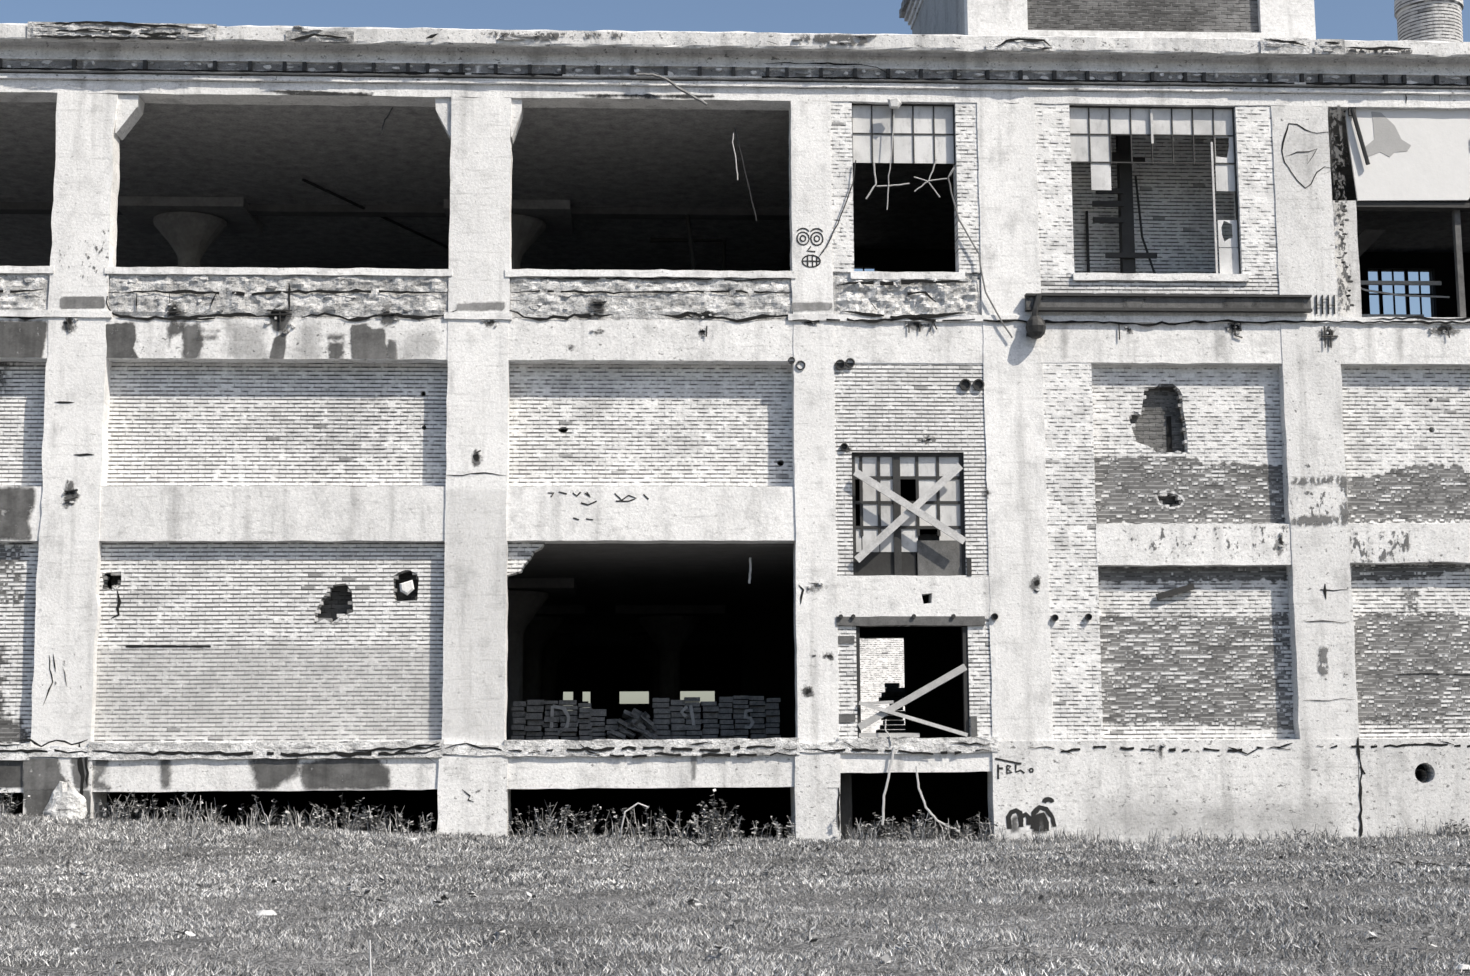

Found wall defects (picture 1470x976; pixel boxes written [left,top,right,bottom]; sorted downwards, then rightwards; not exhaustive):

water stain [60,296,139,358]
water stain [168,321,216,358]
water stain [270,330,286,359]
water stain [328,323,397,359]
water stain [0,487,35,540]
peeling [1094,384,1470,737]
spalling [315,585,353,625]
spalling [393,570,419,601]
crack [1307,584,1347,623]
crack [1393,670,1470,678]
water stain [250,758,390,790]
crack [1030,737,1470,838]